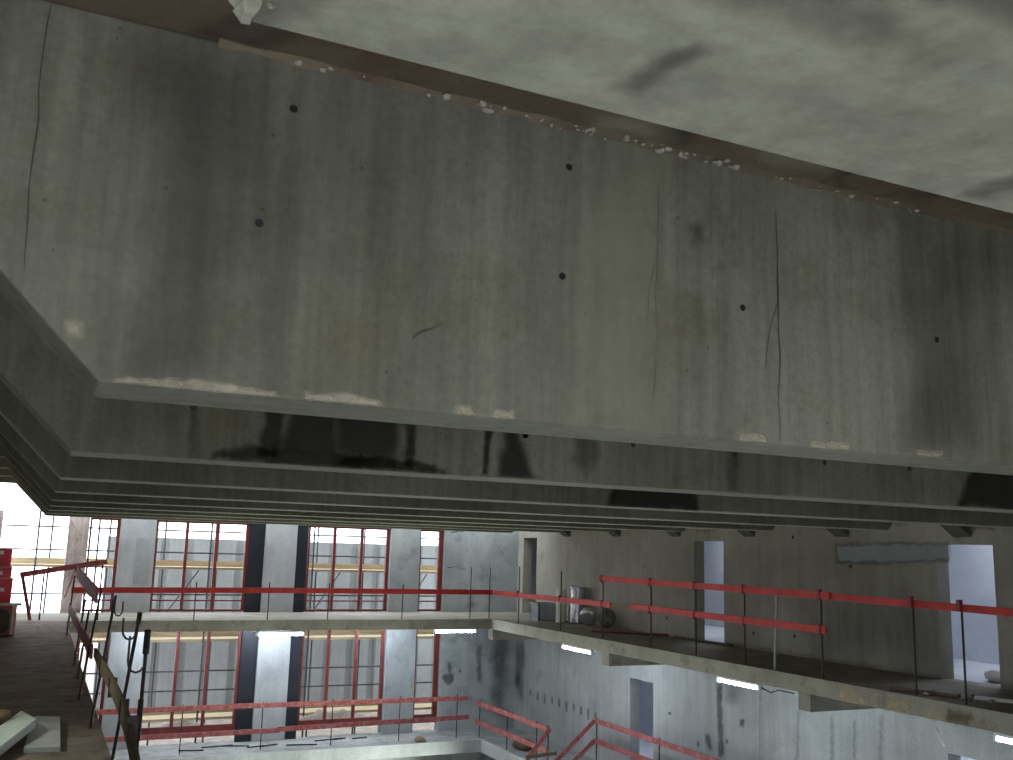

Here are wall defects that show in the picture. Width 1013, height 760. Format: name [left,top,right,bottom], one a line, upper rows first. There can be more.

leakage [214,412,445,474]
leakage [483,431,493,474]
leakage [499,432,531,477]
leakage [608,489,698,511]
leakage [958,472,1013,509]